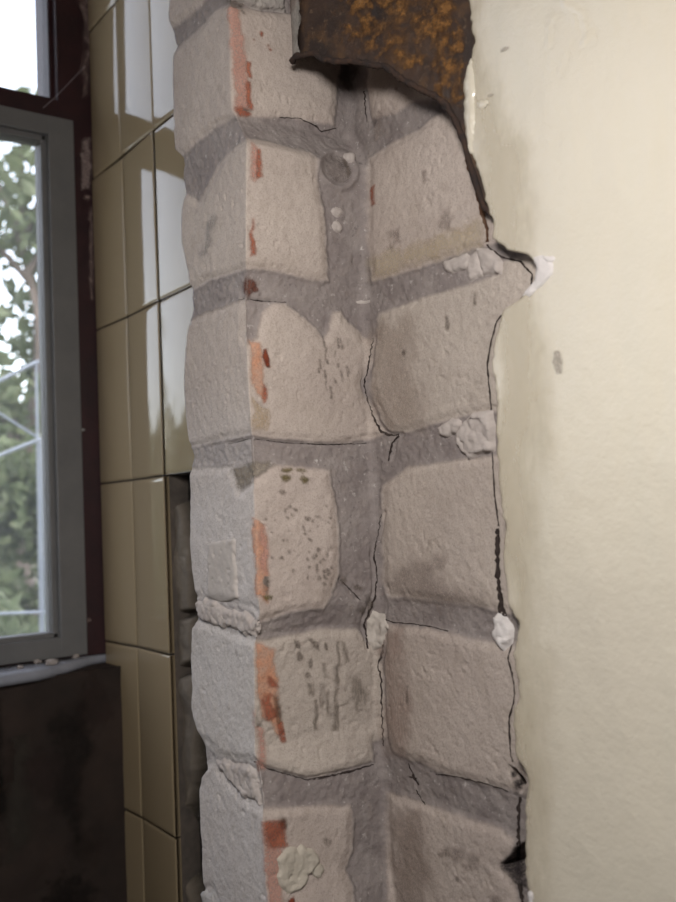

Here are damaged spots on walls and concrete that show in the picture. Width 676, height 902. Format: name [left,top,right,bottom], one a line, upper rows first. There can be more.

peeling [290,0,300,56]
corrosion [346,0,464,102]
spalling [234,462,270,488]
flaking render [348,58,555,902]
peeling [173,475,265,902]